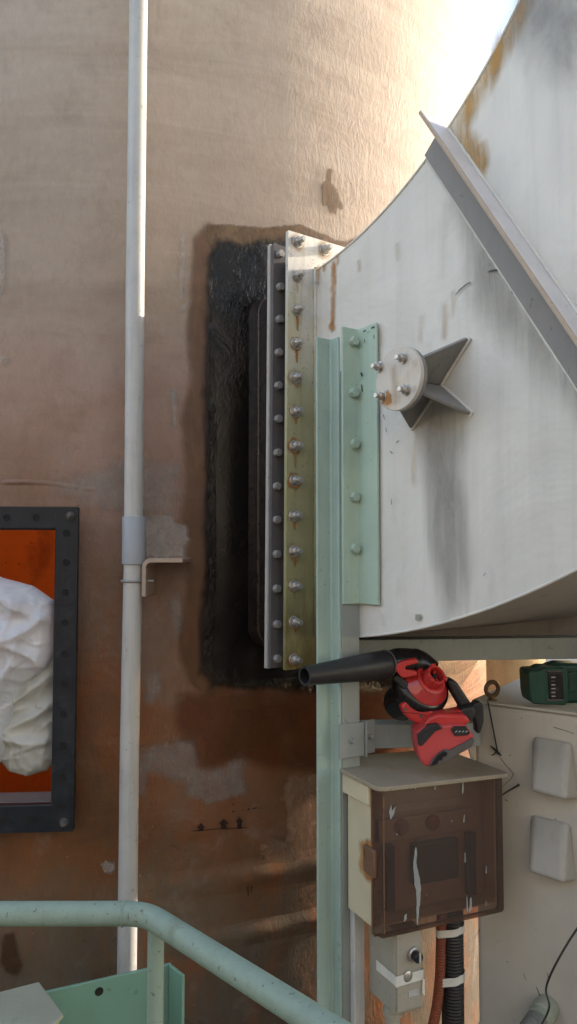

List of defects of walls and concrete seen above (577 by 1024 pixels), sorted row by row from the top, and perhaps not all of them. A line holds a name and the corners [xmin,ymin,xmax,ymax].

corrosion [459,0,527,170]
leakage [322,169,343,214]
corrosion [317,243,335,331]